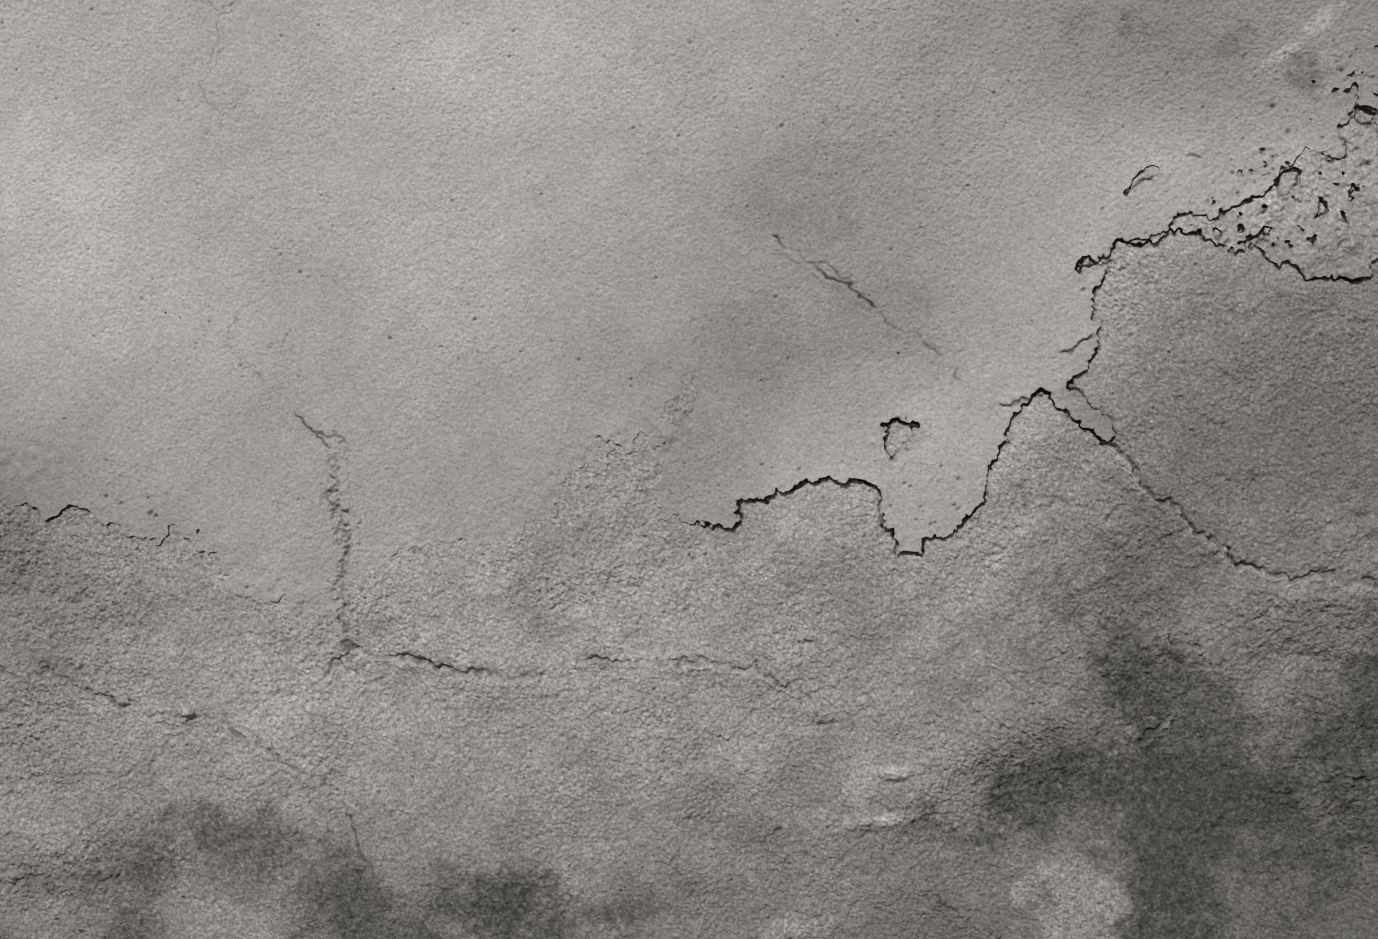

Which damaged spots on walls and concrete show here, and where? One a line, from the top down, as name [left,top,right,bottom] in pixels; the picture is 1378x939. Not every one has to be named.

crack [225,301,838,714]
flaking render [0,232,1145,939]
crack [766,230,970,387]
flaking render [1066,68,1378,578]
flaking render [1171,561,1344,718]
flaking render [1225,854,1378,939]